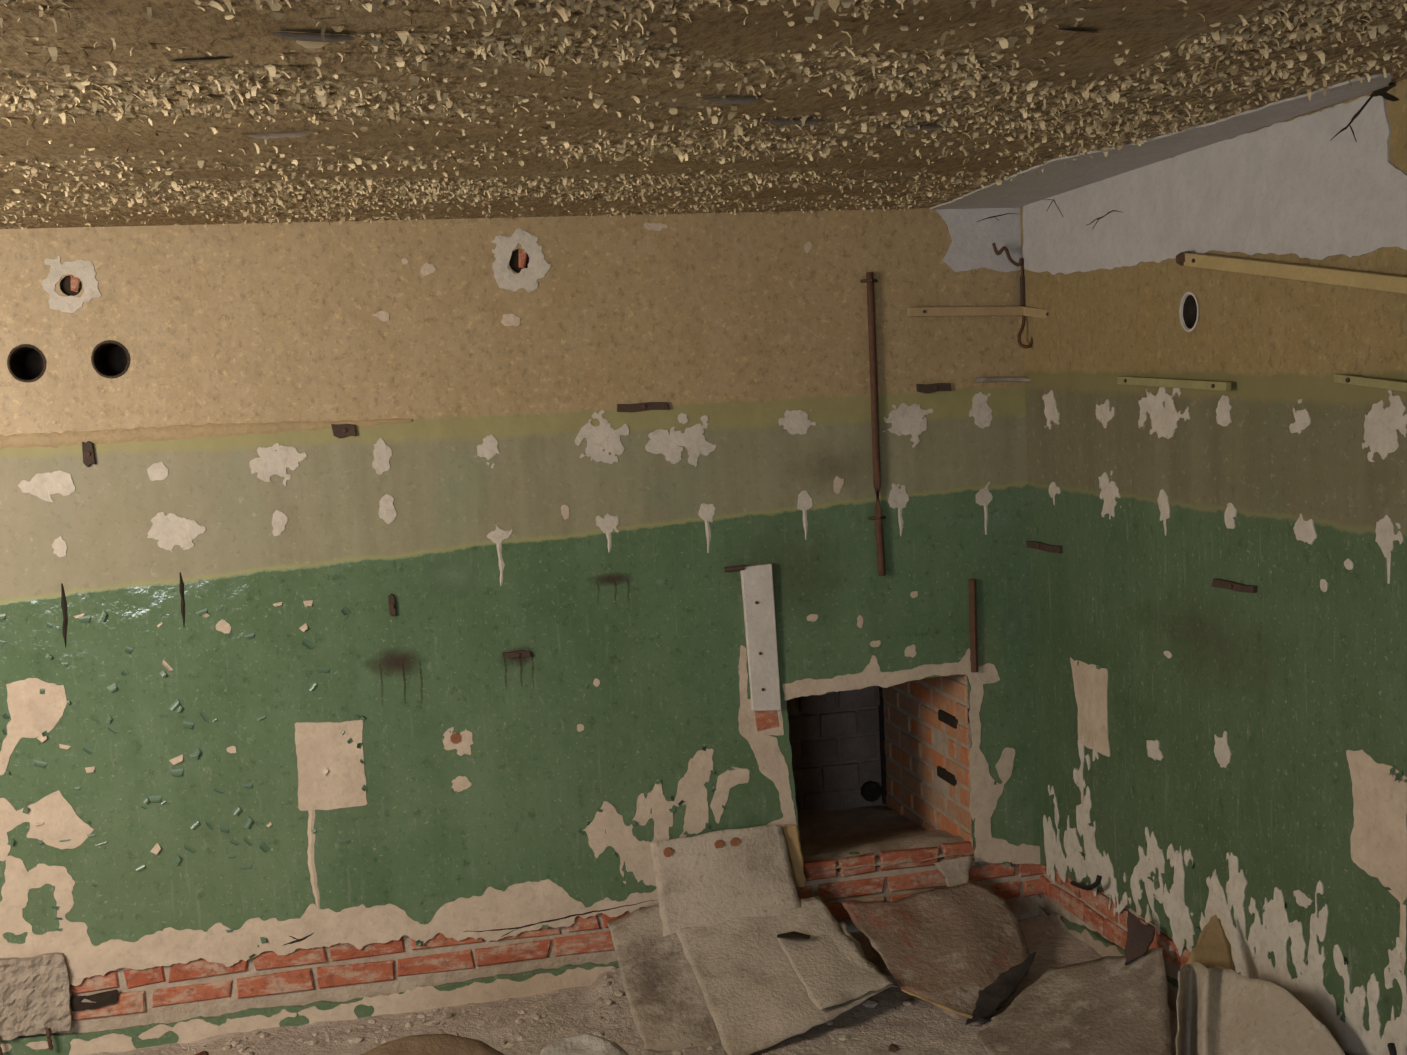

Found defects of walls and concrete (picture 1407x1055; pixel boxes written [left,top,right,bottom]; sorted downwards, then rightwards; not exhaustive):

peeling [0,0,1407,293]
peeling [0,615,1407,1055]